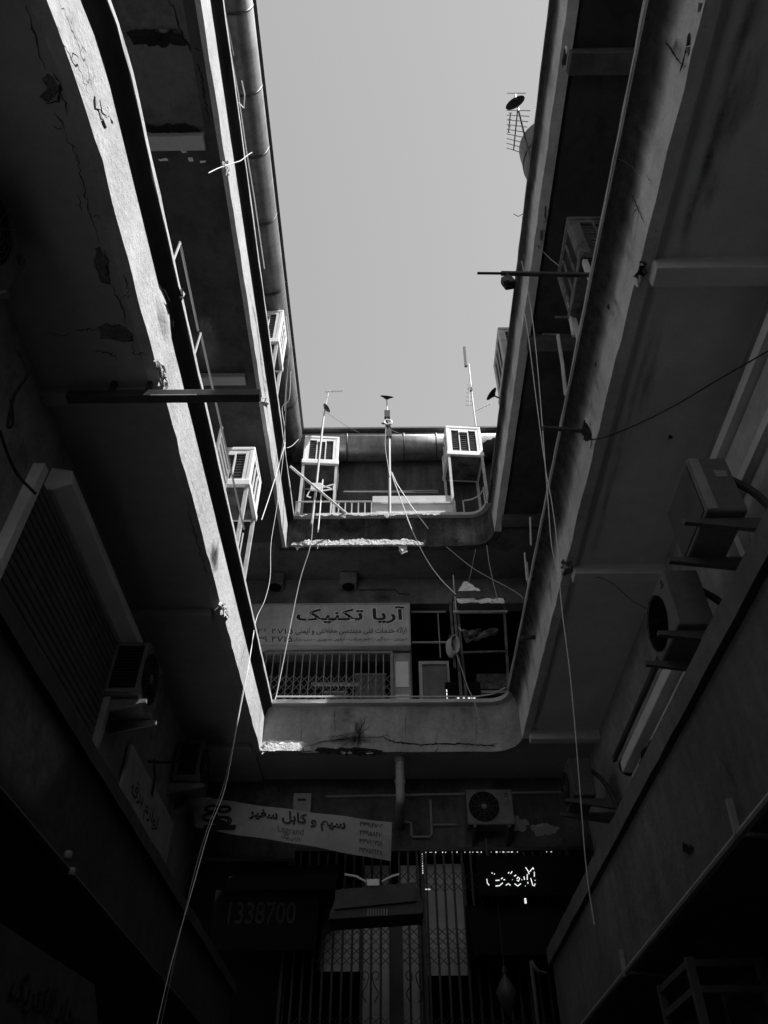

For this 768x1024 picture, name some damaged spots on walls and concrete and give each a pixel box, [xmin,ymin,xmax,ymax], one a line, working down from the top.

crack [59,2,96,91]
spalling [126,28,190,49]
flaking render [40,72,62,104]
crack [52,93,100,243]
crack [273,712,511,755]